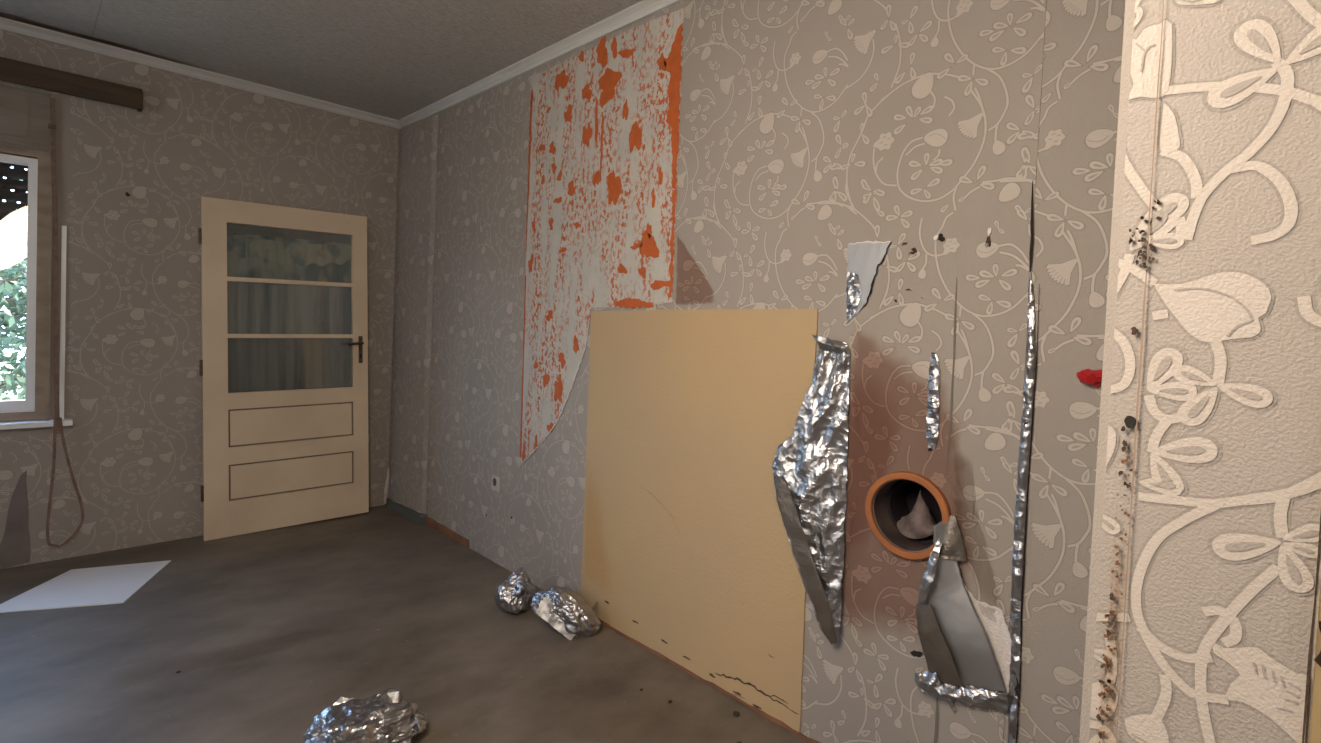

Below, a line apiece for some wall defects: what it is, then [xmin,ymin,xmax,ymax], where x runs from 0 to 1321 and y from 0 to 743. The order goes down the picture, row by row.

peeling [520,8,818,732]
damp [1129,199,1161,271]